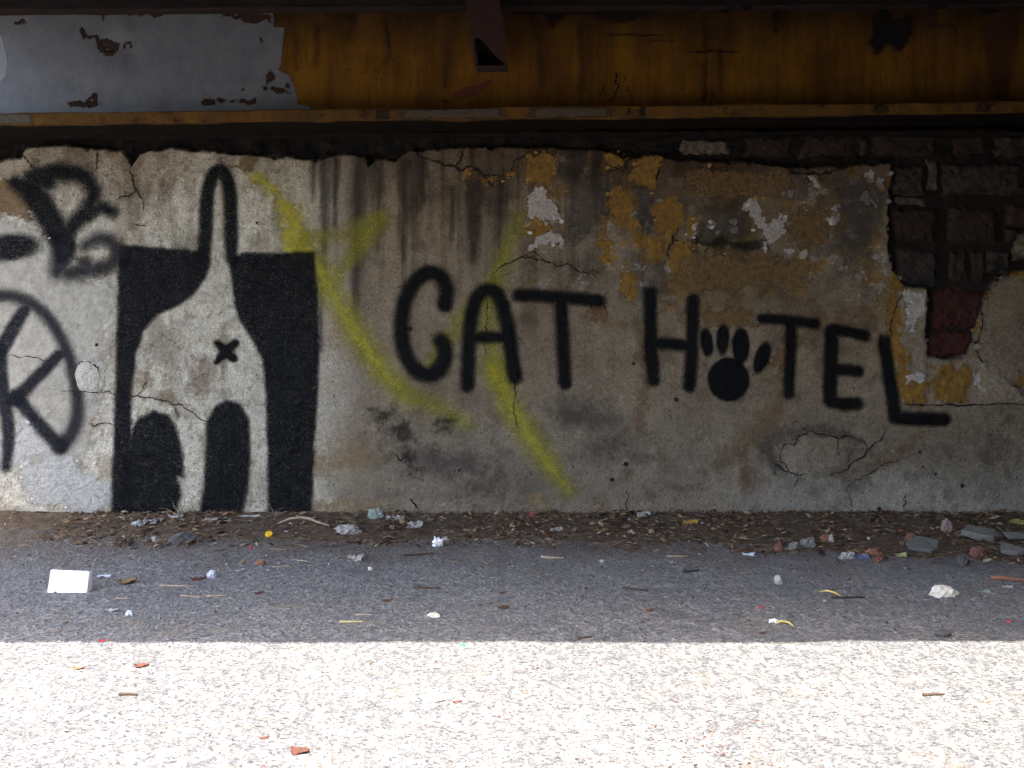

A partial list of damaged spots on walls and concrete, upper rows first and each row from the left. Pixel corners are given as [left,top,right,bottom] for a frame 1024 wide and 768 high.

rust [79,27,132,56]
rust [68,93,101,108]
rust [201,70,292,106]
crack [412,150,527,188]
water stain [312,154,339,299]
water stain [352,156,382,308]
water stain [466,173,482,262]
crack [484,251,601,357]
peeling [592,150,809,302]
spalling [679,136,1024,407]
crack [47,361,216,427]
crack [772,421,901,507]